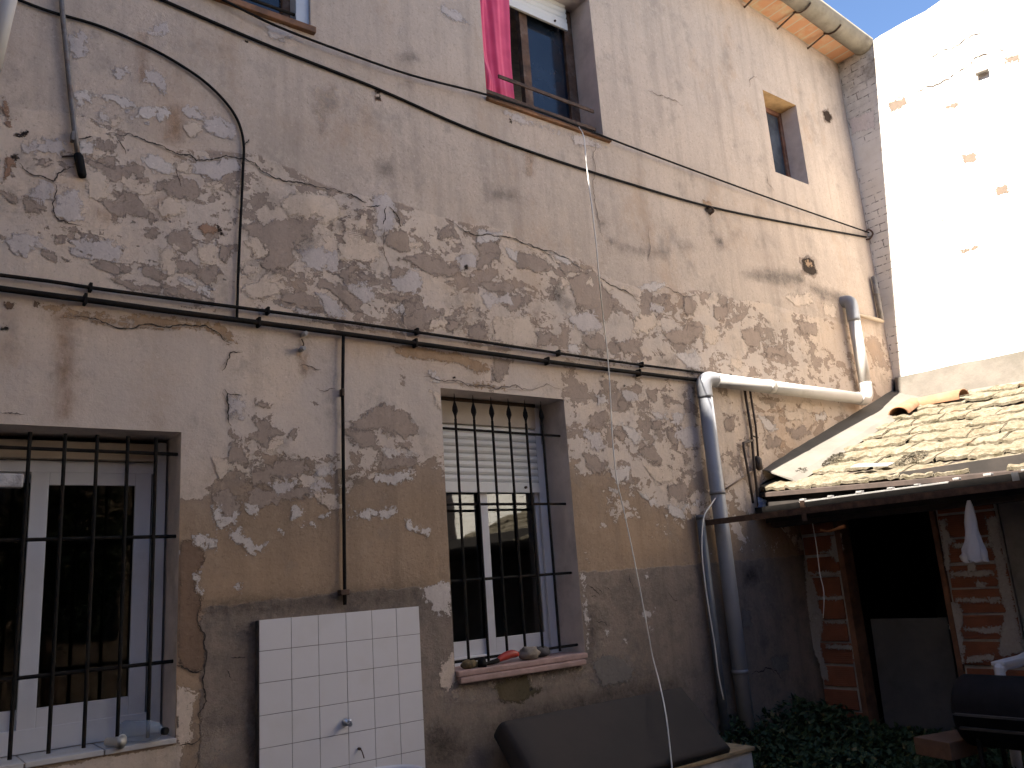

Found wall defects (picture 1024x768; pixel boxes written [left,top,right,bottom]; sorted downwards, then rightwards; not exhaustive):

crack [22,166,78,226]
crack [79,132,401,272]
peeling [0,65,731,410]
crack [449,220,639,302]
spalling [799,255,818,278]
crack [74,316,239,428]
peeling [741,326,787,358]
peeling [785,292,837,337]
peeling [582,376,703,520]
peeling [723,413,736,433]
peeling [754,395,827,452]
spalling [178,392,431,671]